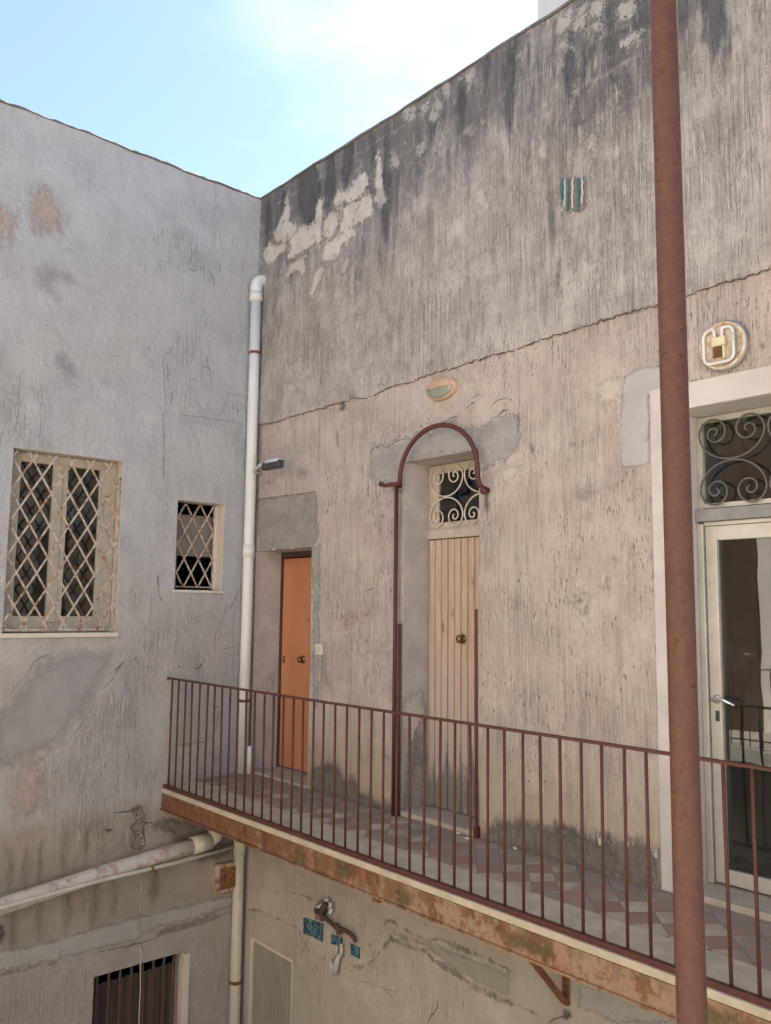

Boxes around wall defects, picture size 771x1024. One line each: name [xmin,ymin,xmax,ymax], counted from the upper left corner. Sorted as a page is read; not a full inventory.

leakage [702,0,725,50]
peeling [401,67,478,160]
leakage [504,41,515,129]
leakage [565,39,587,87]
leakage [371,133,391,239]
peeling [260,142,401,305]
crack [686,268,770,297]
crack [148,303,658,517]
flaking render [115,805,152,850]
leakage [154,819,209,840]
leakage [198,836,233,861]
leakage [483,819,661,890]